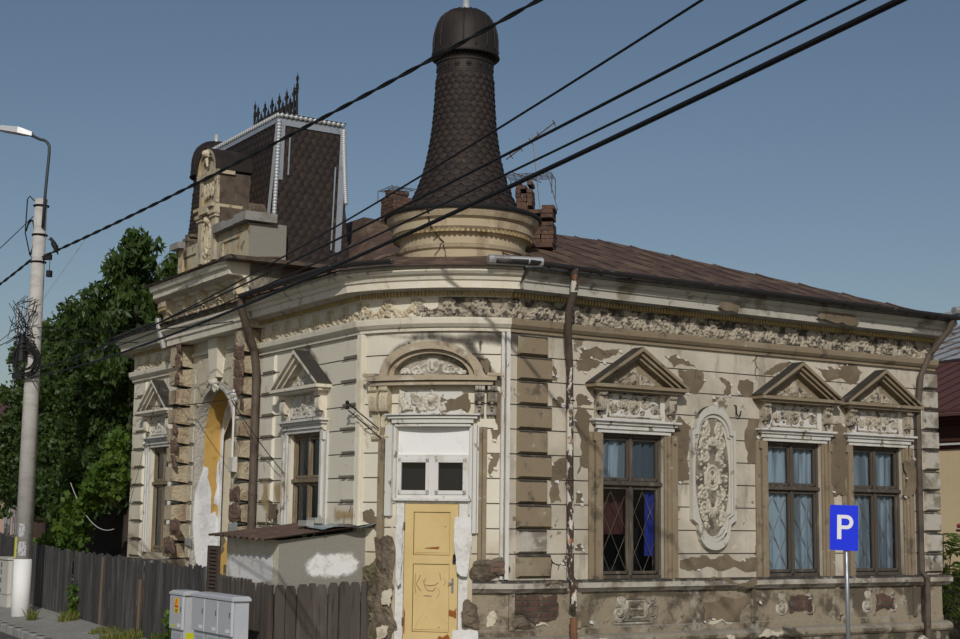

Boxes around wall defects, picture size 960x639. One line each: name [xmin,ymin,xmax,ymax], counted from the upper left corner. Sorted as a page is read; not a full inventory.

peeling [578,346,623,374]
peeling [665,354,706,395]
peeling [712,377,755,406]
damp [262,484,281,526]
damp [334,508,353,525]
spalling [360,509,397,639]
spalling [469,557,511,581]